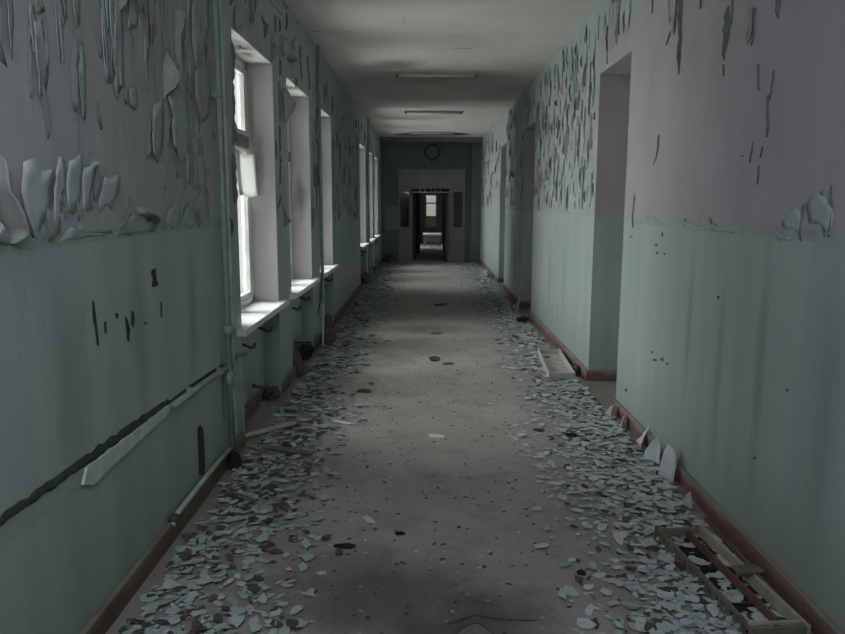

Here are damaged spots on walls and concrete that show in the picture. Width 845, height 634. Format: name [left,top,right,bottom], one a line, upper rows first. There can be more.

peeling [666,0,683,75]
peeling [722,0,733,76]
peeling [0,0,237,252]
peeling [230,0,381,230]
peeling [482,0,630,211]
peeling [757,64,774,137]
peeling [92,300,107,346]
peeling [115,311,147,342]
spalling [81,405,172,485]
spalling [197,425,205,475]
peeling [634,426,677,485]